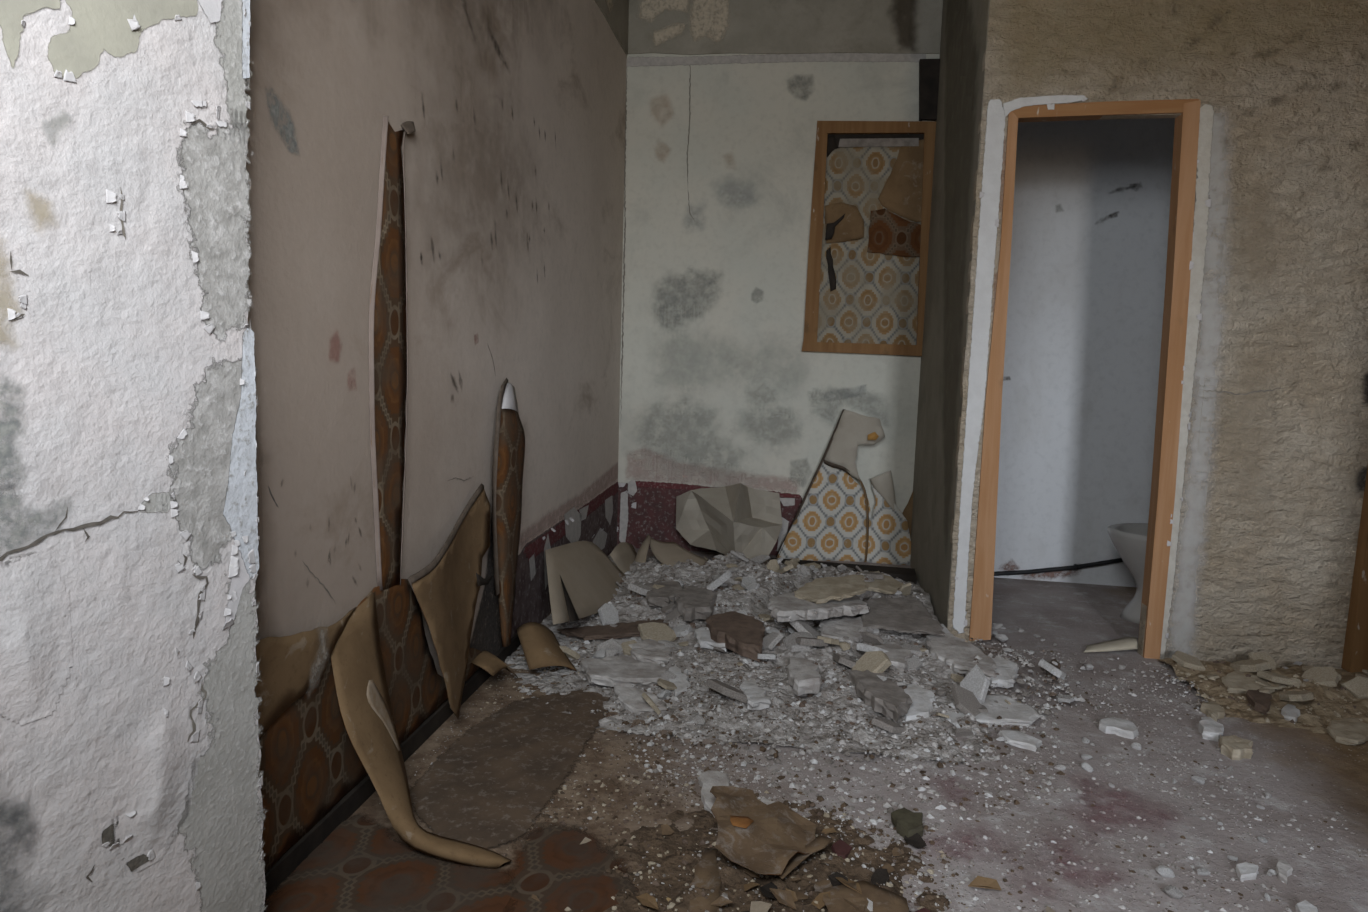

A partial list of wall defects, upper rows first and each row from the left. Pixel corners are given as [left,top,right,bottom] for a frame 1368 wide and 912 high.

peeling [0,0,198,83]
peeling [106,187,126,239]
peeling [7,295,28,321]
water stain [0,383,66,549]
peeling [138,0,267,912]
crack [0,507,140,561]
peeling [777,498,795,551]
peeling [469,519,515,655]
spalling [102,811,137,850]
spalling [127,850,156,872]